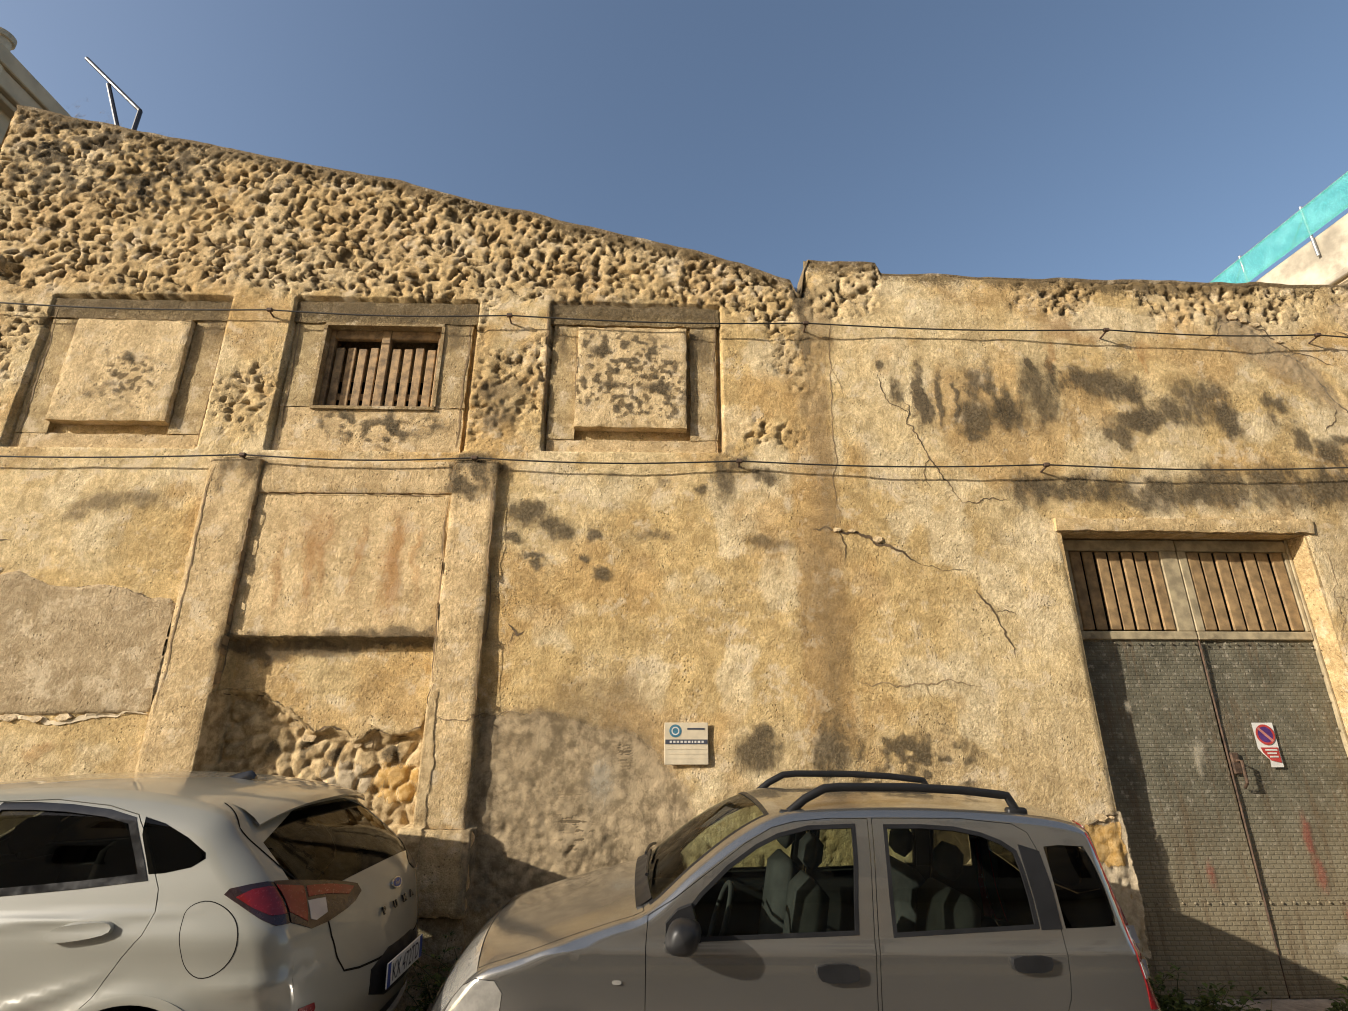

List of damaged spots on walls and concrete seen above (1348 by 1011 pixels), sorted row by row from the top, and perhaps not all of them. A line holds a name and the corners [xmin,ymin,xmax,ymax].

damp [1024,358,1056,384]
damp [910,360,1015,441]
damp [1125,389,1144,406]
damp [1214,404,1241,440]
damp [445,462,487,500]
crack [813,308,1017,658]
peeling [0,713,73,723]
flaking render [189,688,438,864]
flaking render [1081,811,1152,960]